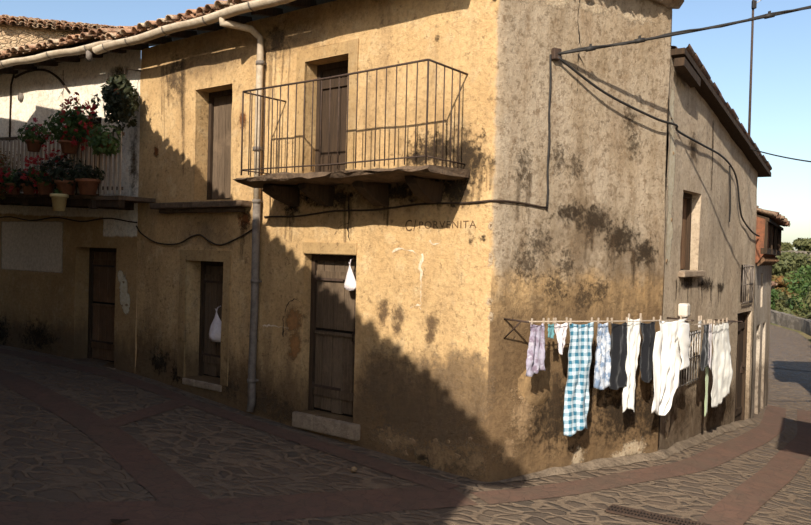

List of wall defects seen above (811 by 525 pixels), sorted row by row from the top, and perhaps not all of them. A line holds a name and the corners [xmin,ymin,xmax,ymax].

crack [577,0,586,91]
water stain [166,55,184,96]
water stain [401,127,495,207]
water stain [552,202,659,266]
peeling [118,270,130,315]
water stain [378,300,403,333]
water stain [426,316,439,344]